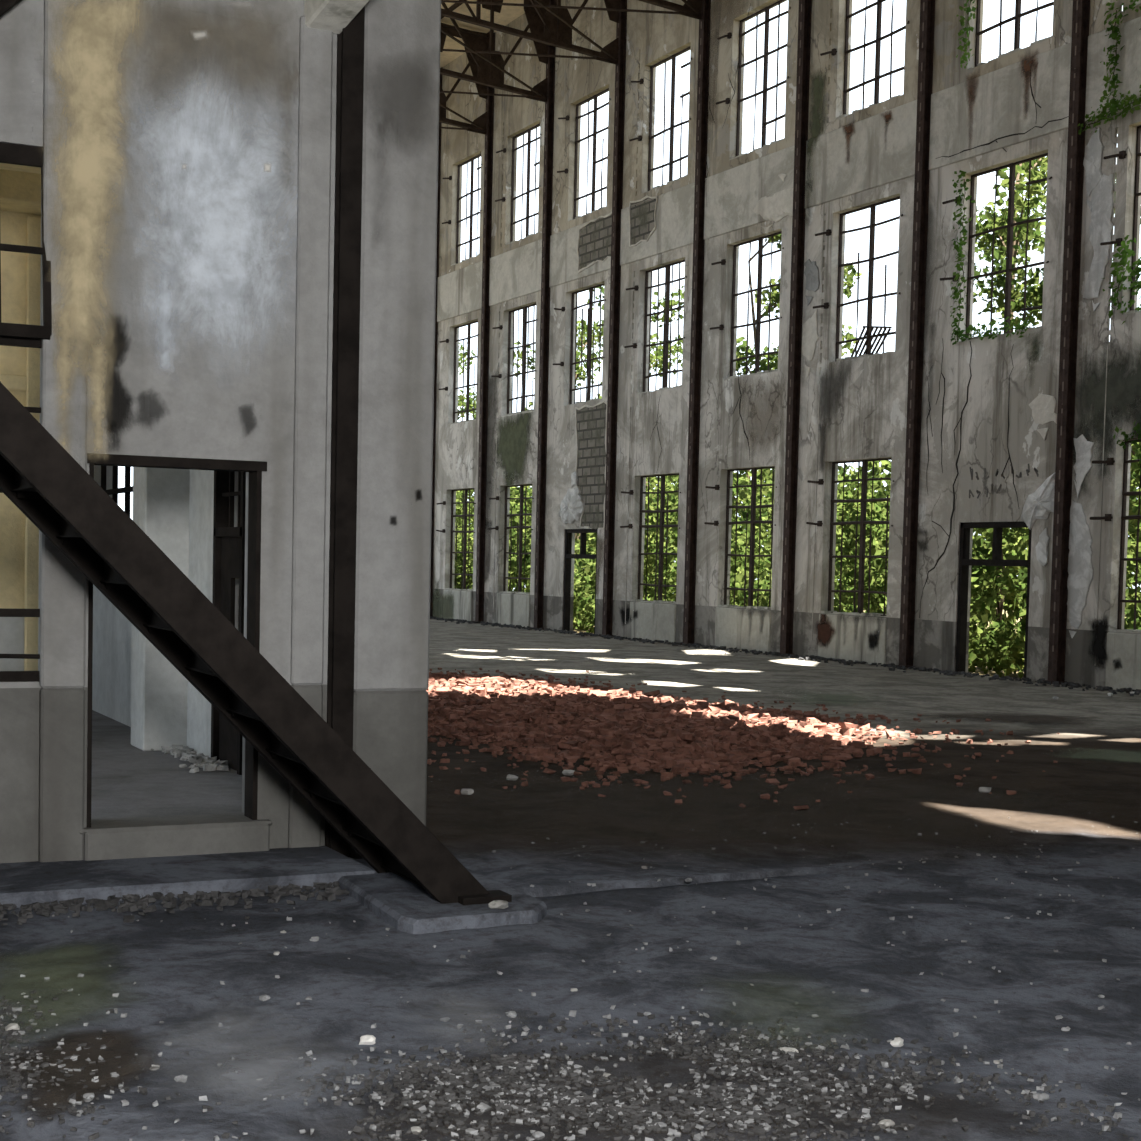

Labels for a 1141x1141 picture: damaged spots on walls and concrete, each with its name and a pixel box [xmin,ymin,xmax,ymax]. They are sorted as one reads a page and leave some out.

rust [1021,55,1037,112]
leakage [54,0,139,451]
flaking render [577,212,612,273]
flaking render [629,195,658,247]
flaking render [575,400,607,530]
crack [919,338,972,618]
crack [1002,344,1019,507]
peeling [1021,473,1055,567]
peeling [1029,394,1057,440]
peeling [1067,434,1122,669]